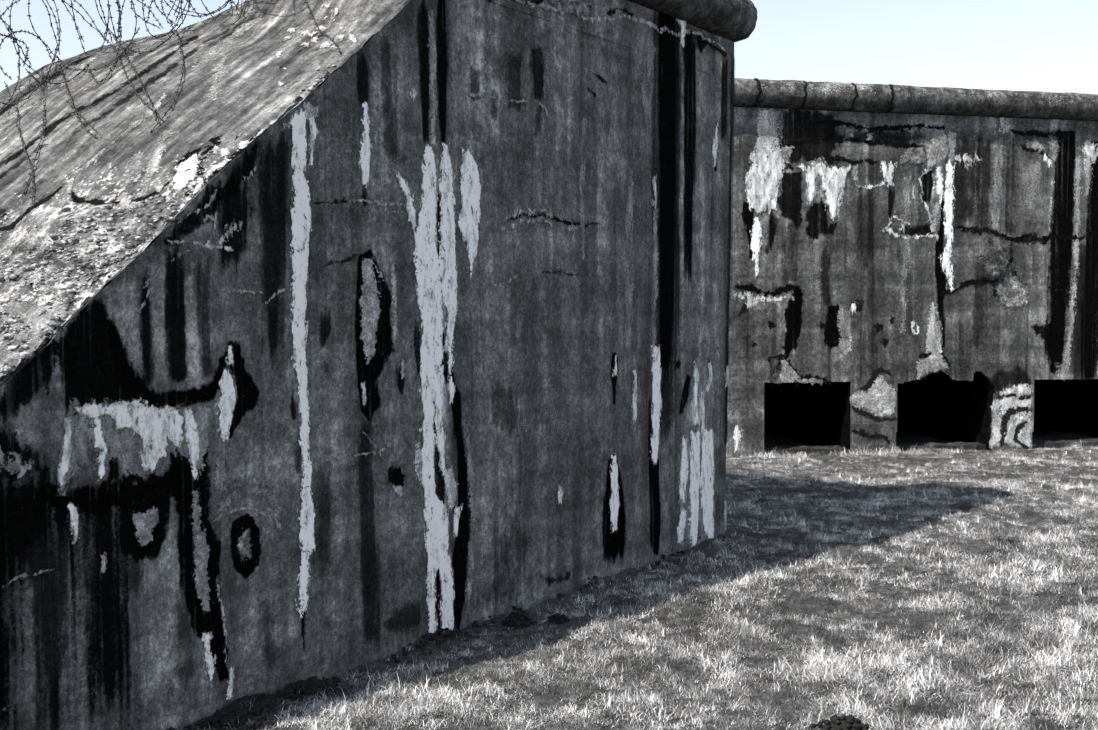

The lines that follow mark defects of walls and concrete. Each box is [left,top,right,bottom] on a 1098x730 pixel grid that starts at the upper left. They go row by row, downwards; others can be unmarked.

spalling [55,397,218,496]
damp [0,93,331,730]
spalling [355,249,398,422]
crack [479,269,578,287]
crack [492,206,599,234]
damp [578,109,608,260]
damp [611,167,635,404]
damp [631,12,913,555]
spalling [777,109,982,241]
damp [930,137,1004,347]
damp [1032,129,1098,380]